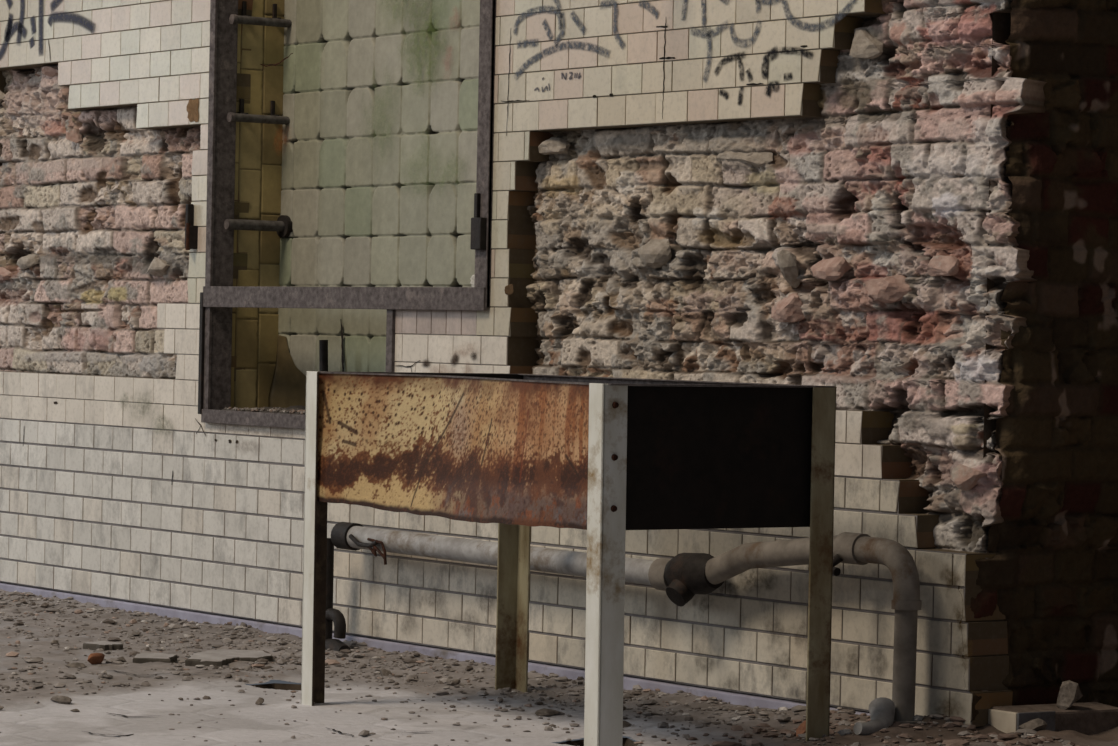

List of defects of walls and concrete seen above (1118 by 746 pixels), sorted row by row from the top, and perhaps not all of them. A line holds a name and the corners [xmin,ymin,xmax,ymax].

spalling [0,65,201,379]
spalling [505,0,1047,559]